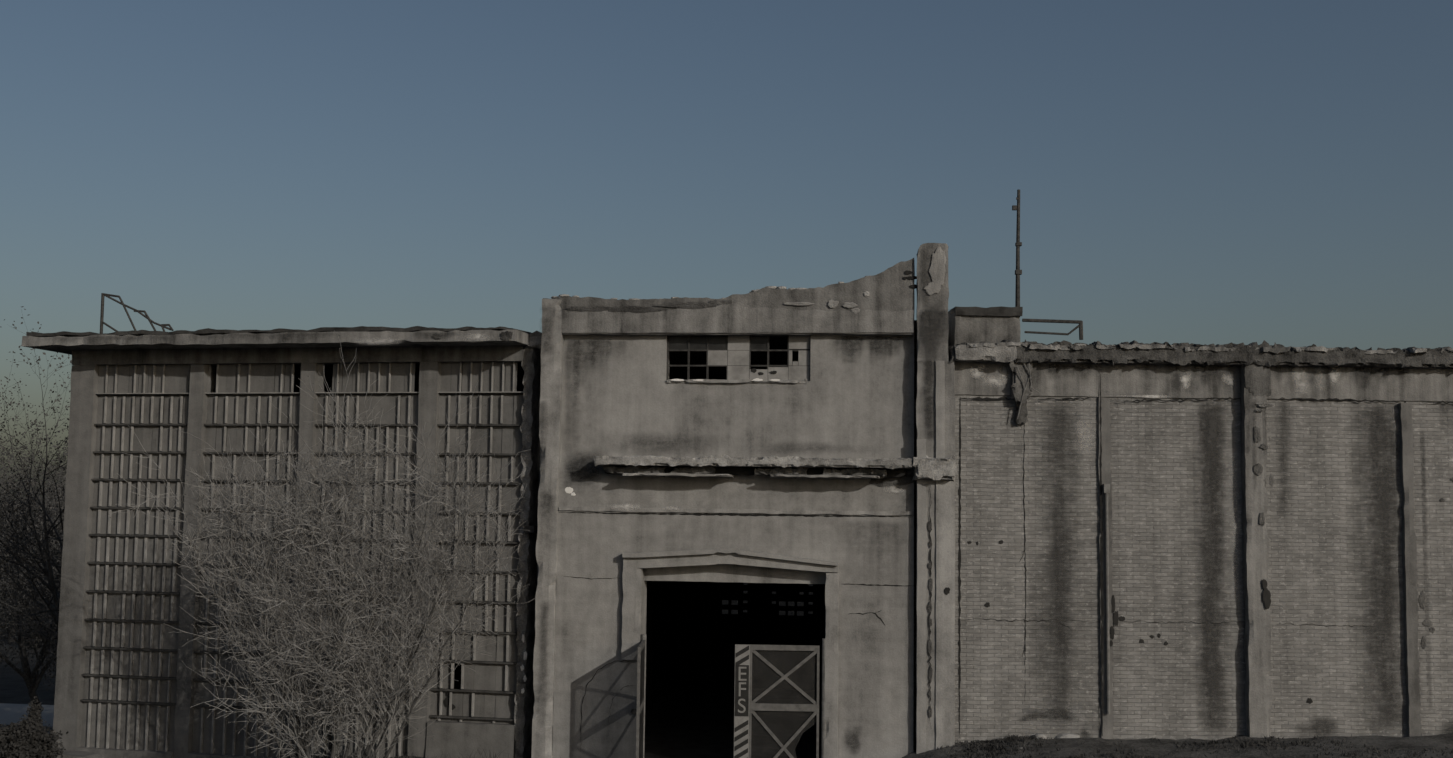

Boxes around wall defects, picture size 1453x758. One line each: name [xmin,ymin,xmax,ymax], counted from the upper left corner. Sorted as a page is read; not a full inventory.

peeling [903,247,946,295]
damp [1181,364,1232,387]
damp [1201,408,1221,720]
damp [1372,410,1397,641]